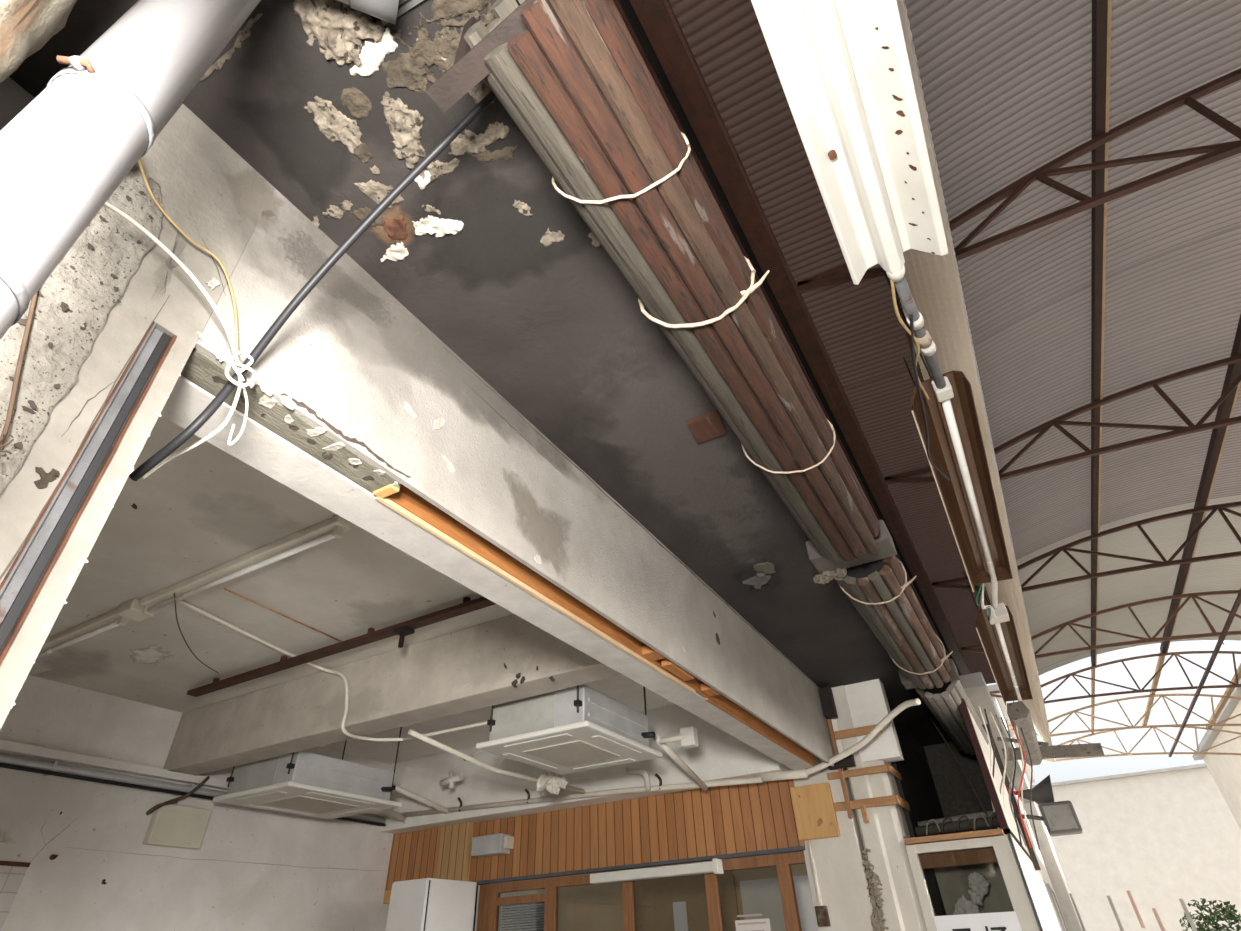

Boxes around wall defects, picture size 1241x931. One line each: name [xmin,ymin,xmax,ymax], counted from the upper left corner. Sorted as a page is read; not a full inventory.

peeling [293,0,517,229]
peeling [412,204,464,237]
spalling [512,199,533,216]
peeling [380,241,409,262]
spalling [540,228,565,247]
water stain [510,477,566,570]